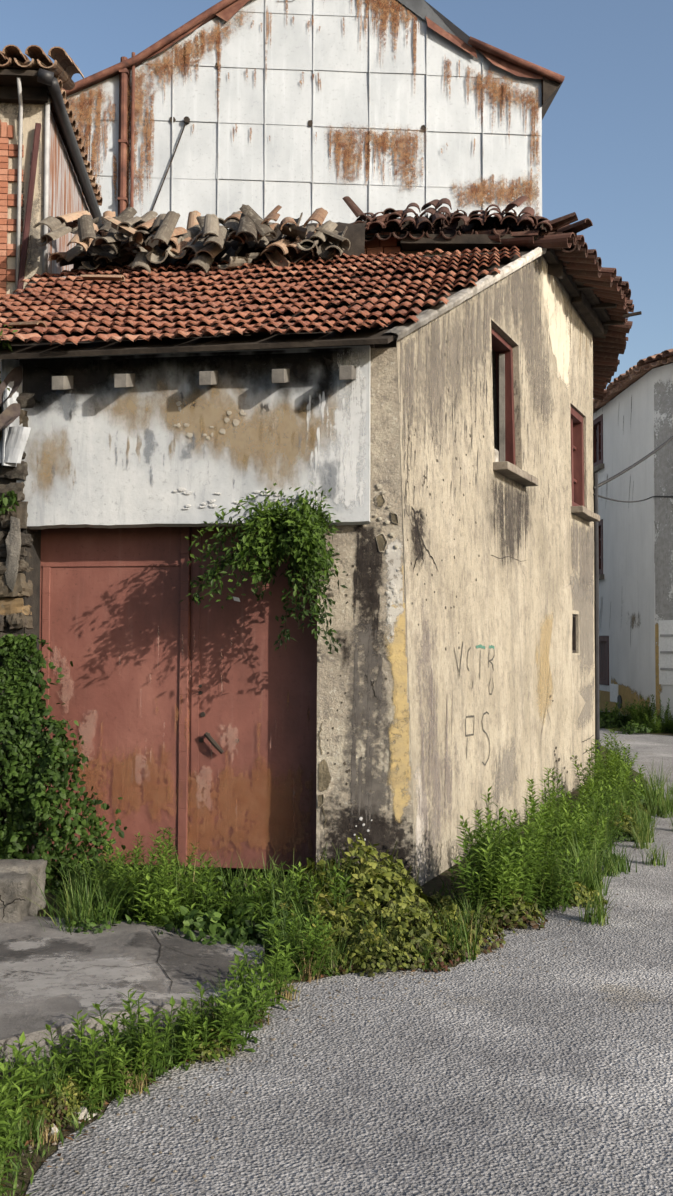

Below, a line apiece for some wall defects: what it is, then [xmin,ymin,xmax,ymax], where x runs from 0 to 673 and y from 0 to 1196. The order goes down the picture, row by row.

corrosion [66,0,320,206]
corrosion [315,128,424,188]
corrosion [343,0,419,86]
corrosion [444,59,540,215]
peeling [174,401,246,440]
water stain [400,258,593,566]
flaking render [317,722,358,834]
water stain [320,525,457,877]
peeling [369,484,435,886]
crack [4,930,194,994]